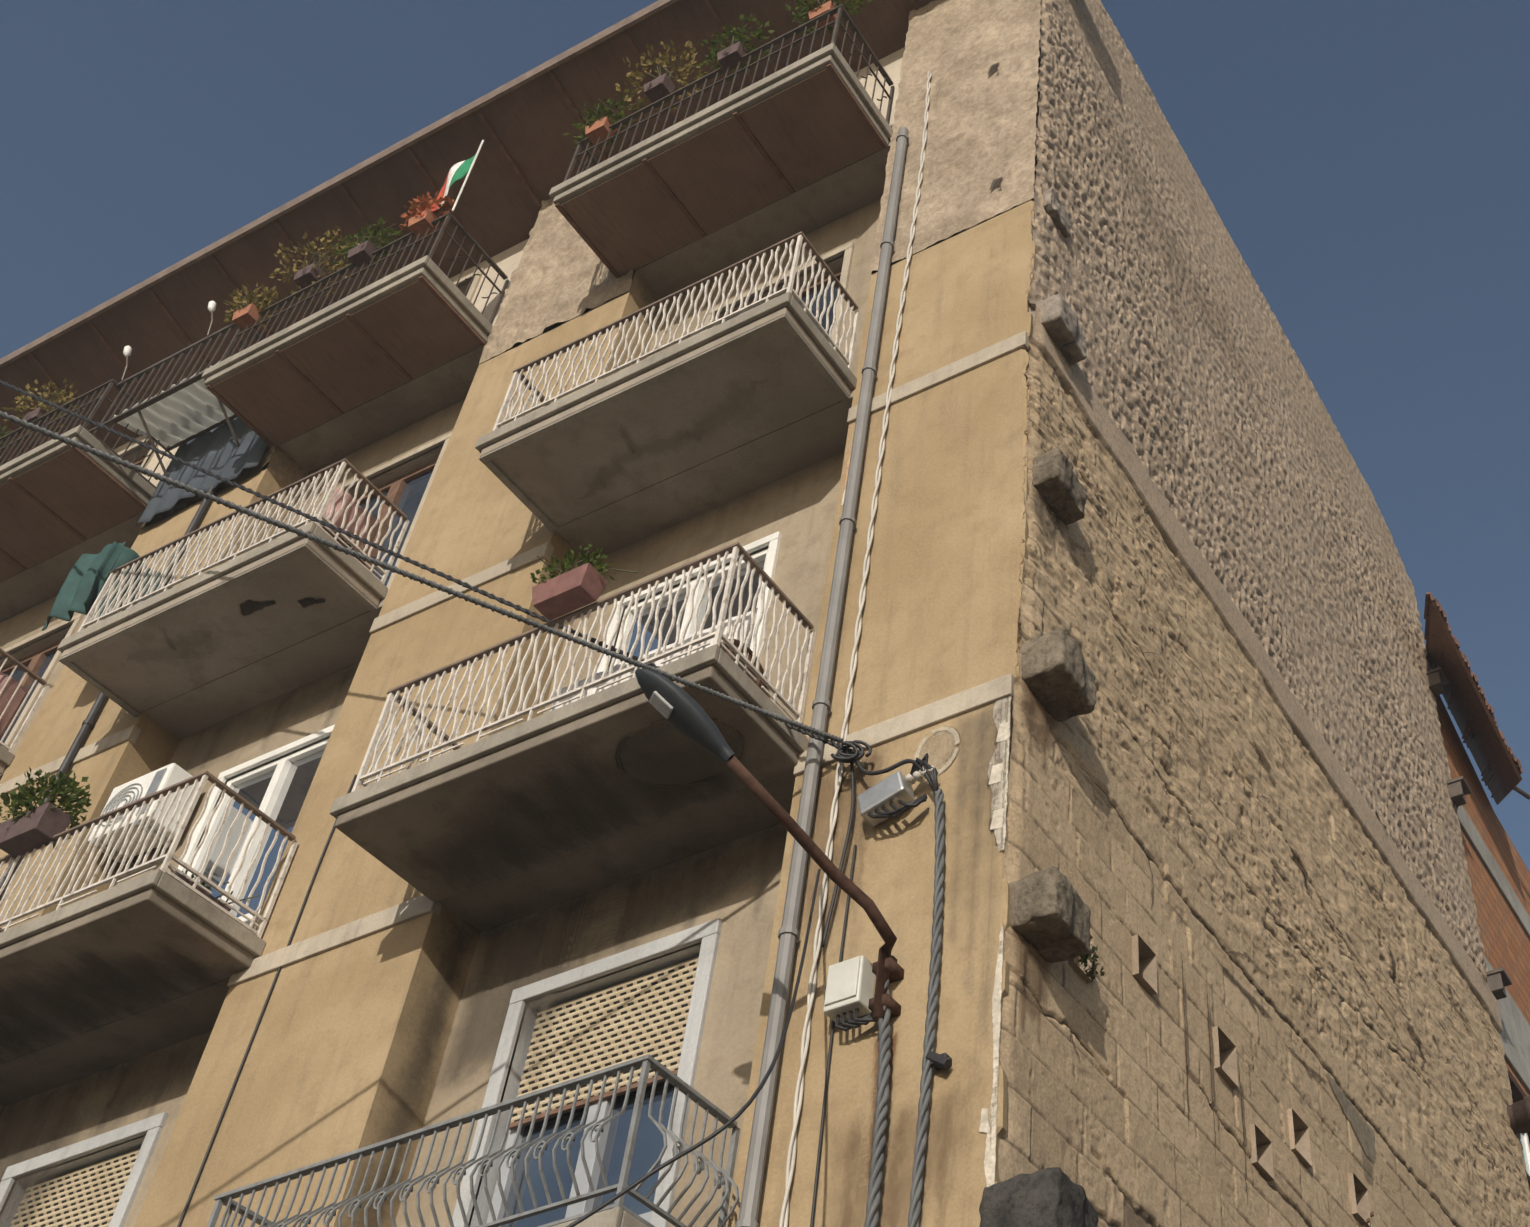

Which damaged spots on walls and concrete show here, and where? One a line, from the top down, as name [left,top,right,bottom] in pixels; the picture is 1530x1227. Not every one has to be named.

crack [1097,584,1460,1083]
crack [1024,985,1093,1059]
damp [1181,952,1190,1123]
damp [1206,978,1217,1173]
damp [1238,1061,1248,1202]
crack [1057,741,1458,1227]